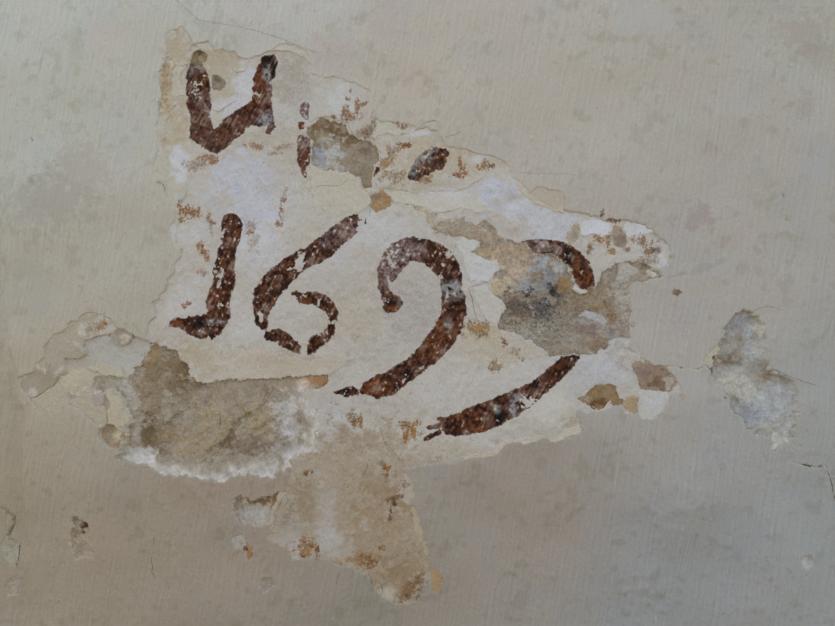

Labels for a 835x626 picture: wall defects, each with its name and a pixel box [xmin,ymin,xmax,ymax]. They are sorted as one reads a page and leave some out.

peeling [19,26,680,604]
spalling [704,310,796,451]
crack [801,464,835,498]